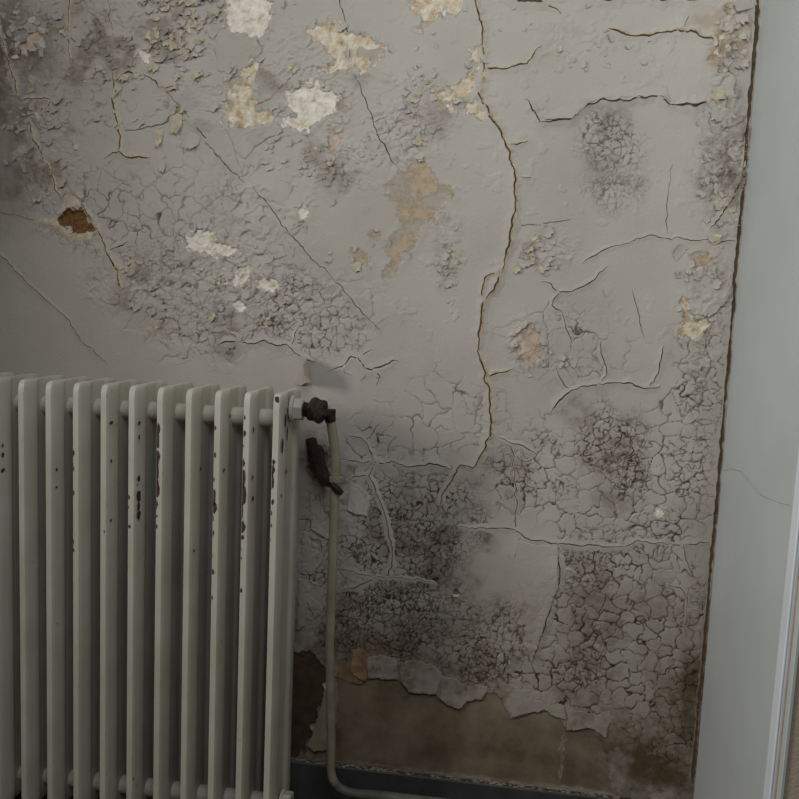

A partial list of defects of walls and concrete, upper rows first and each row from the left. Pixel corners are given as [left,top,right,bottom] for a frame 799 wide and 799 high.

crack [0,11,52,104]
spalling [406,0,468,34]
spalling [429,44,490,121]
peeling [545,82,670,119]
crack [0,252,108,364]
crack [75,193,138,298]
spalling [181,223,283,315]
crack [103,66,400,385]
peeling [672,0,757,343]
crack [309,0,787,784]
peeling [514,538,559,656]
peeling [291,649,611,792]